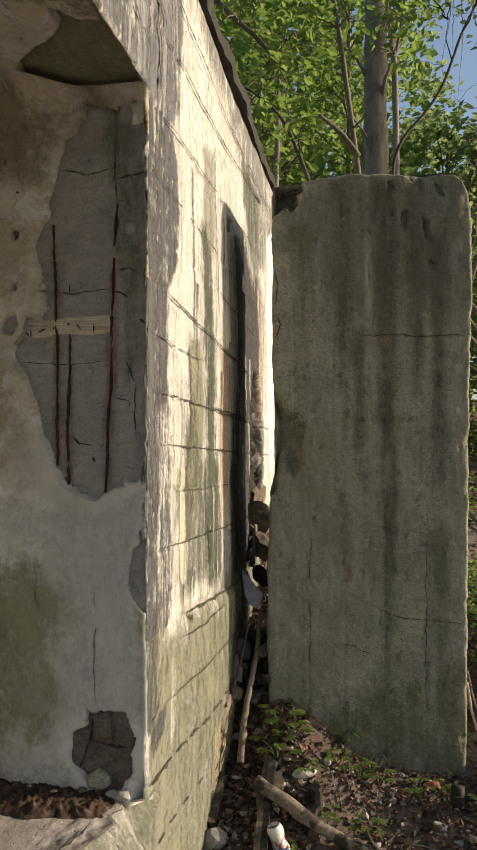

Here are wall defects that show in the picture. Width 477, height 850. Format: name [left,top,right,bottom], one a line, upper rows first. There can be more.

spalling [20,8,143,85]
spalling [2,99,151,498]
crack [355,315,471,341]
damp [0,504,135,744]
crack [346,533,465,702]
spalling [72,710,142,850]